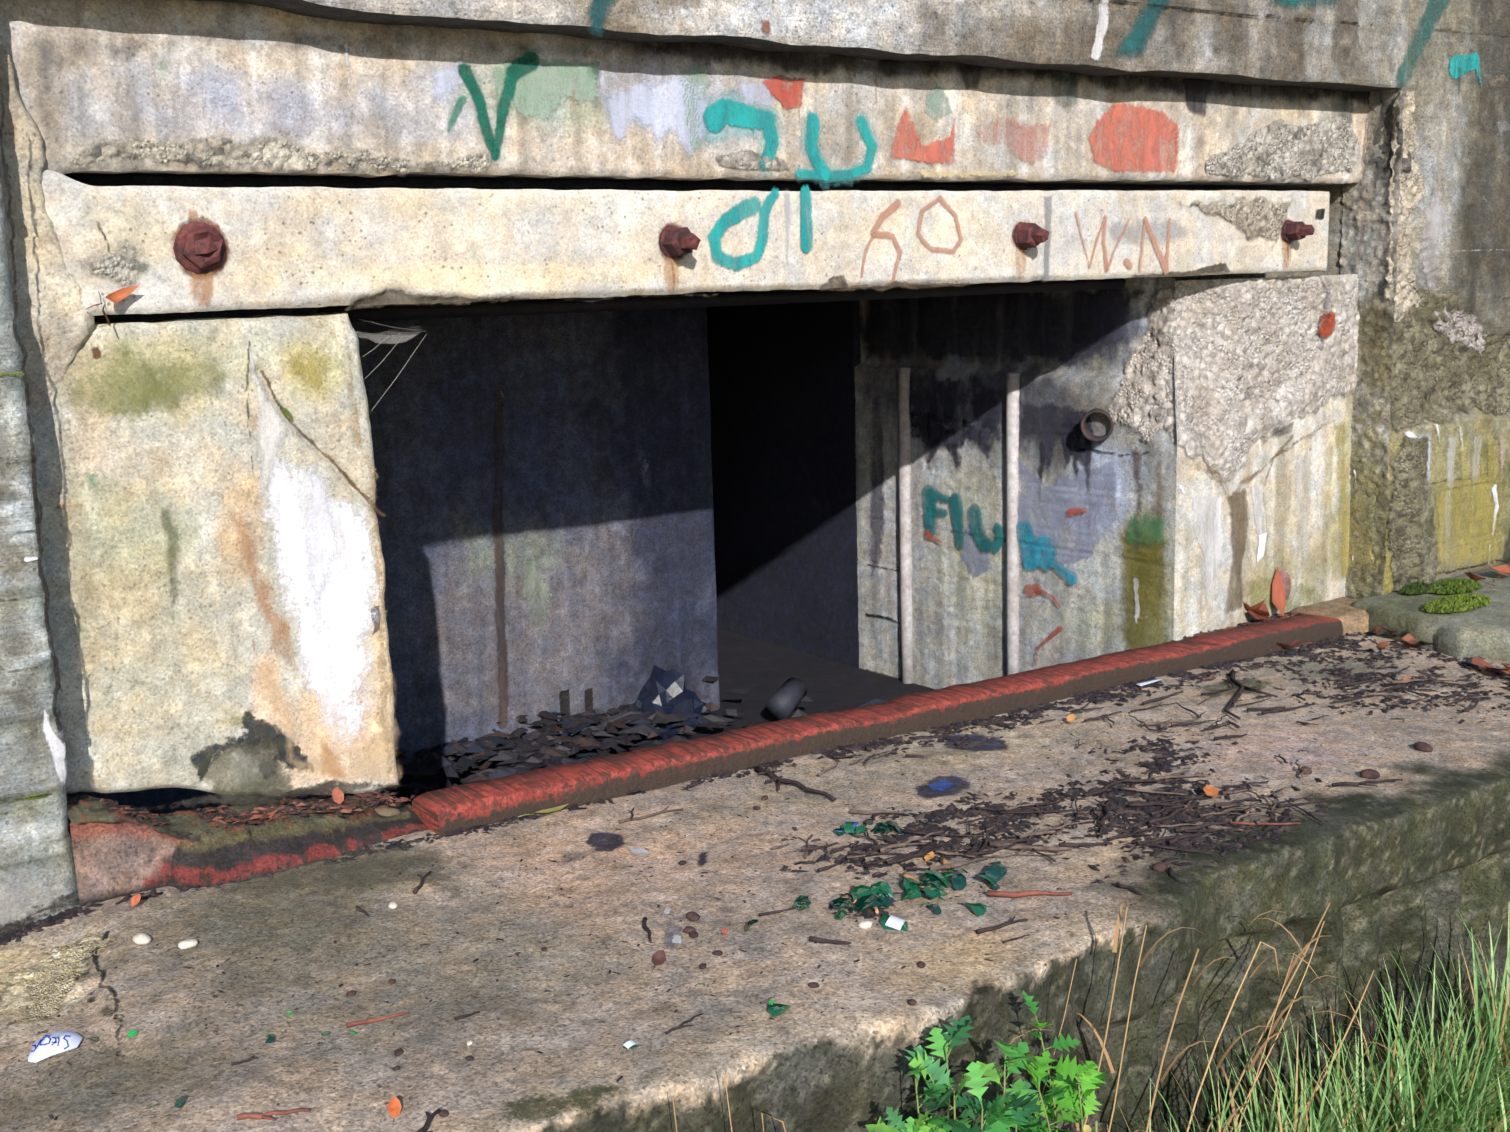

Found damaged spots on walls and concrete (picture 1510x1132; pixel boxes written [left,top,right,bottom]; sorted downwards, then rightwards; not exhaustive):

spalling [1205,116,1358,181]
spalling [1179,197,1291,240]
corrosion [174,211,229,305]
corrosion [659,223,687,290]
spalling [820,275,970,291]
crack [246,341,385,517]
leakage [920,422,993,468]
leakage [1070,424,1094,488]
spalling [1018,263,1360,565]
leakage [1179,435,1293,610]
leakage [190,710,314,780]
crack [68,931,124,1058]